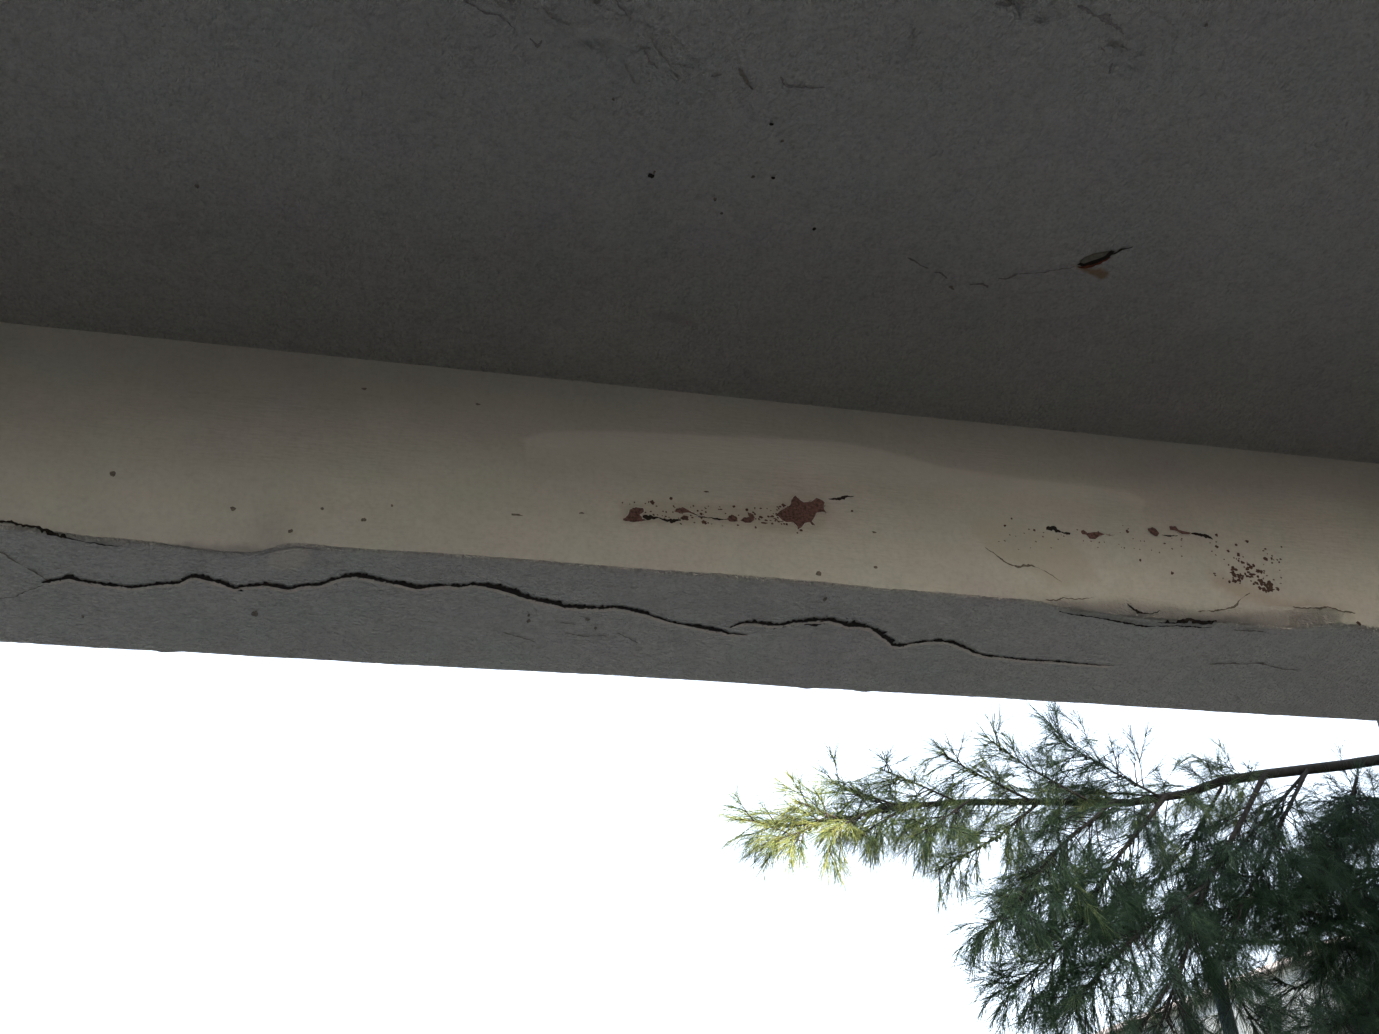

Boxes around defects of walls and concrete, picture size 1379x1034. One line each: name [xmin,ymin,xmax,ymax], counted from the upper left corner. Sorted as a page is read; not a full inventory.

crack [0,520,1114,668]